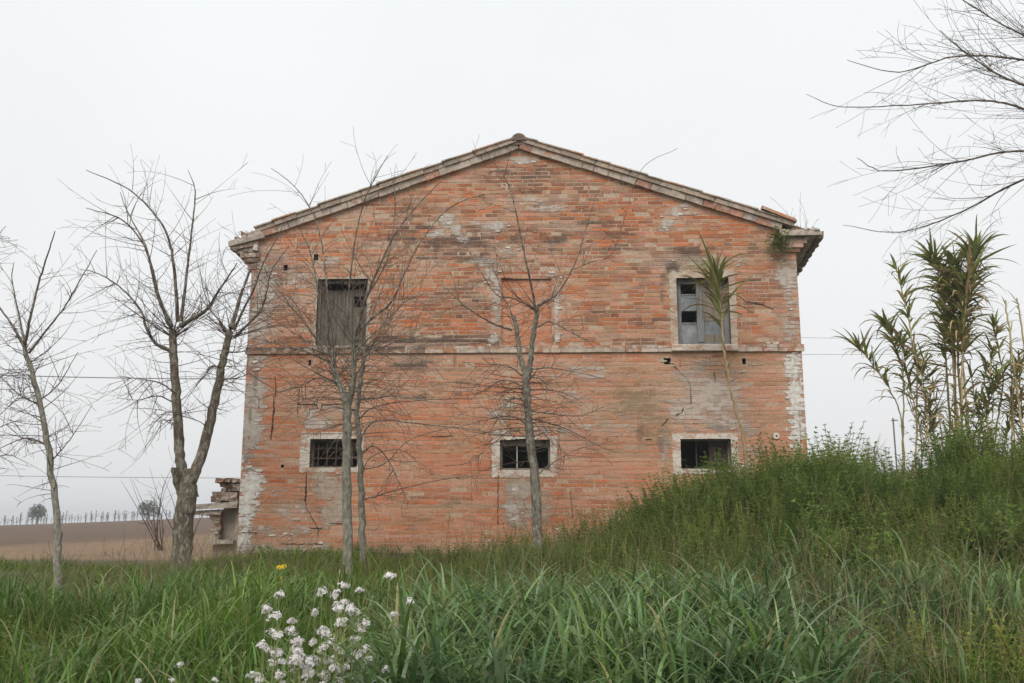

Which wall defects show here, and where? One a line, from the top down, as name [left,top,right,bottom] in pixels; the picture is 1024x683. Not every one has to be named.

peeling [237,254,343,556]
crack [258,380,342,439]
crack [646,364,716,440]
peeling [766,258,806,454]